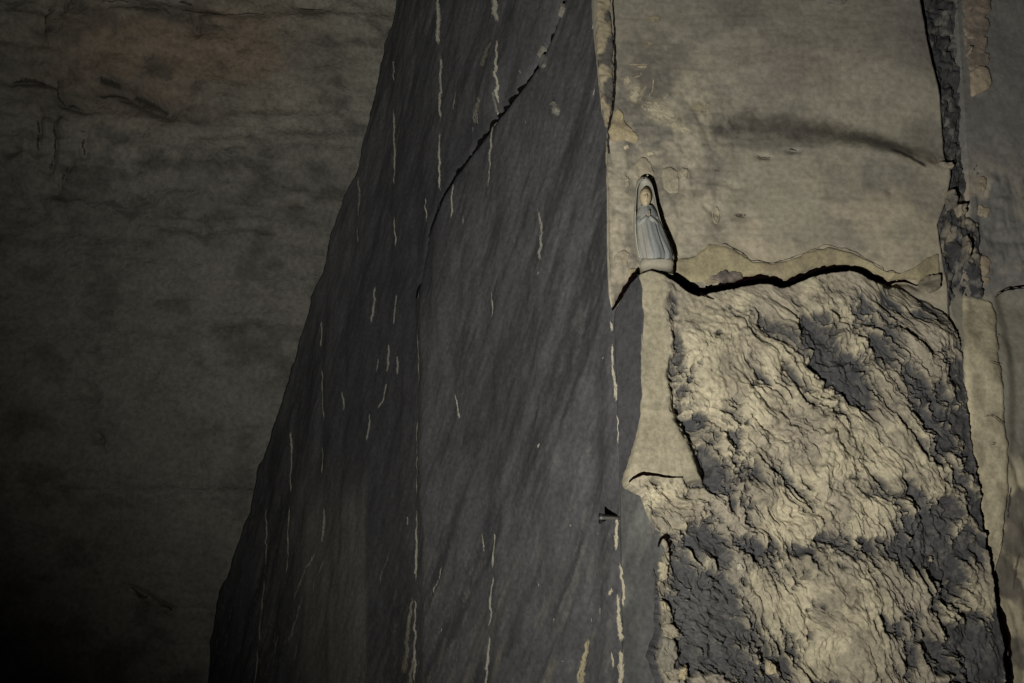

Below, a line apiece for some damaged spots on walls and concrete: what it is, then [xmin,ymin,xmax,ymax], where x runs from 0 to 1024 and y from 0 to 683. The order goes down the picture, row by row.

peeling [962,0,992,97]
crack [428,0,566,244]
crack [612,270,640,310]
crack [668,264,918,300]
crack [629,472,683,483]
spalling [614,243,1009,683]